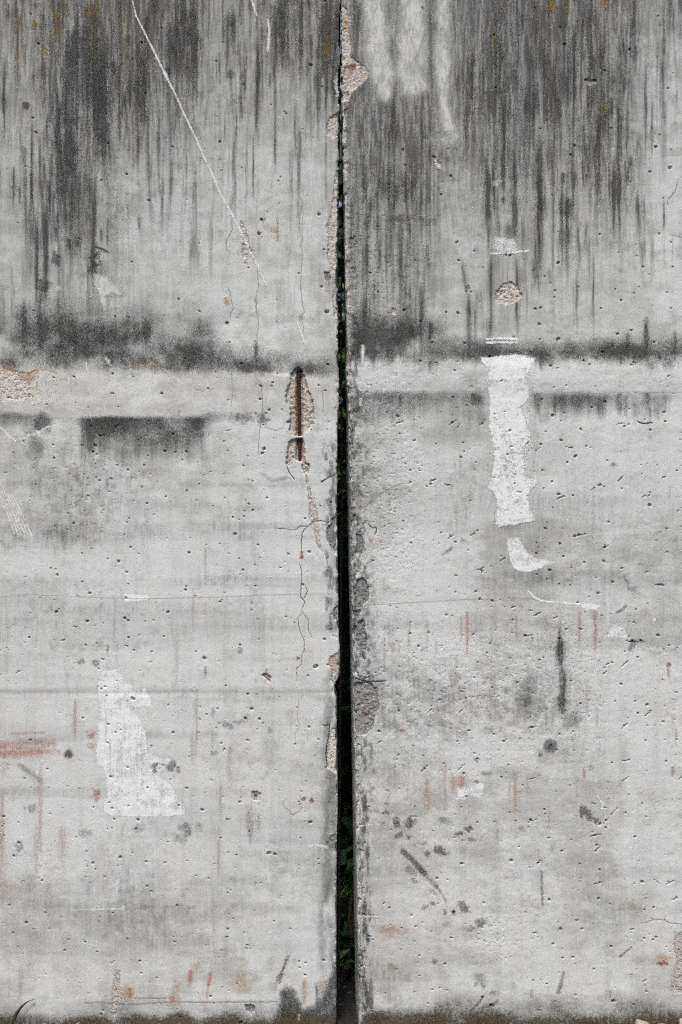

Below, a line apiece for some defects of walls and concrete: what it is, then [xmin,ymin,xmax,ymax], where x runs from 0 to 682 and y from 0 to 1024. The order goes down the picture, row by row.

water stain [0,90,151,367]
water stain [81,417,207,451]
spalling [286,368,336,551]
spalling [324,6,380,767]
water stain [351,289,438,364]
water stain [358,0,474,143]
water stain [452,303,548,366]
water stain [485,35,517,240]
spalling [496,281,522,306]
water stain [560,99,627,250]
crack [0,517,334,768]
spalling [356,781,364,1010]